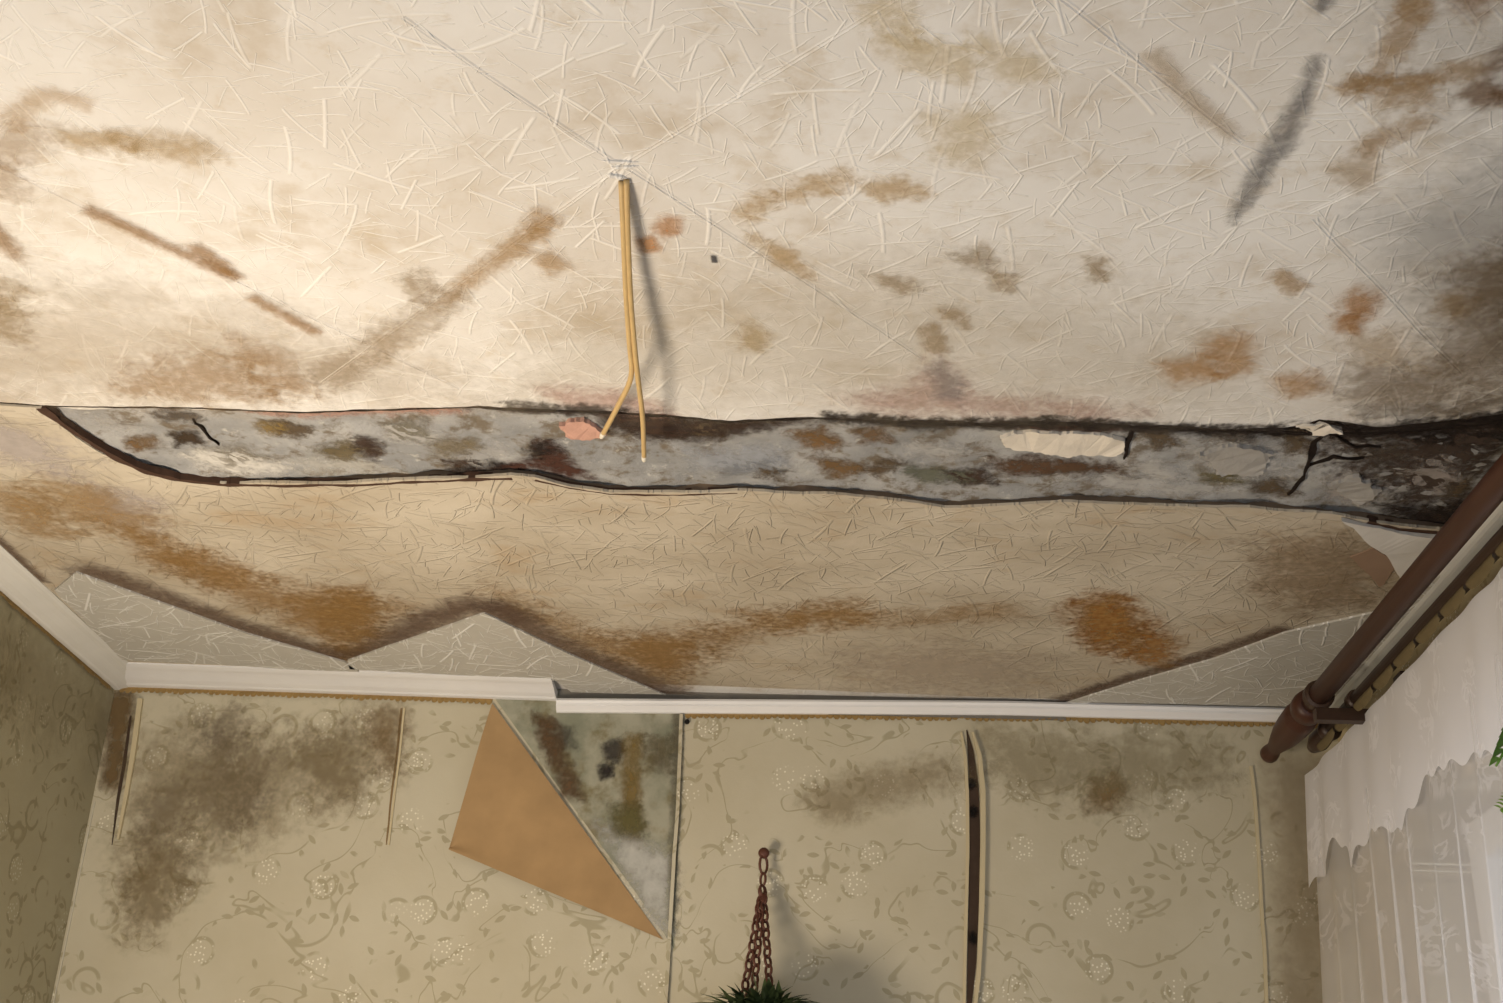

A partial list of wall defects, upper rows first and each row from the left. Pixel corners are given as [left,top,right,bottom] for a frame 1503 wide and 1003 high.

damp [1239,84,1310,207]
damp [89,209,232,276]
damp [0,482,155,538]
damp [162,551,373,652]
peeling [0,402,1503,699]
damp [1253,533,1372,608]
damp [565,608,871,686]
flaking render [496,694,679,948]
damp [968,778,978,817]